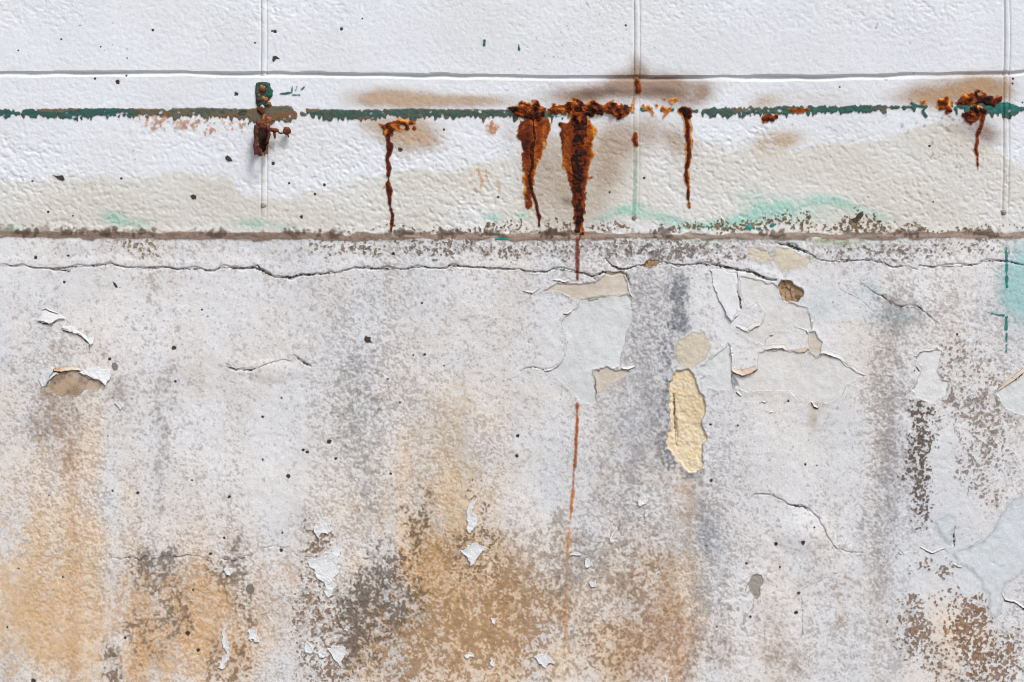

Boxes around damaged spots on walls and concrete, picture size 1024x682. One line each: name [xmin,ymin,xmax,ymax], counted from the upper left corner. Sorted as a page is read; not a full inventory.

corrosion [379,118,416,231]
corrosion [507,78,693,280]
corrosion [920,89,1002,167]
peeling [37,307,94,353]
peeling [38,357,118,397]
crack [3,259,776,308]
peeling [299,207,1024,473]
crack [777,243,1023,268]
corrosion [566,402,579,555]
water stain [129,548,236,681]
water stain [331,493,551,682]
crack [761,493,853,578]